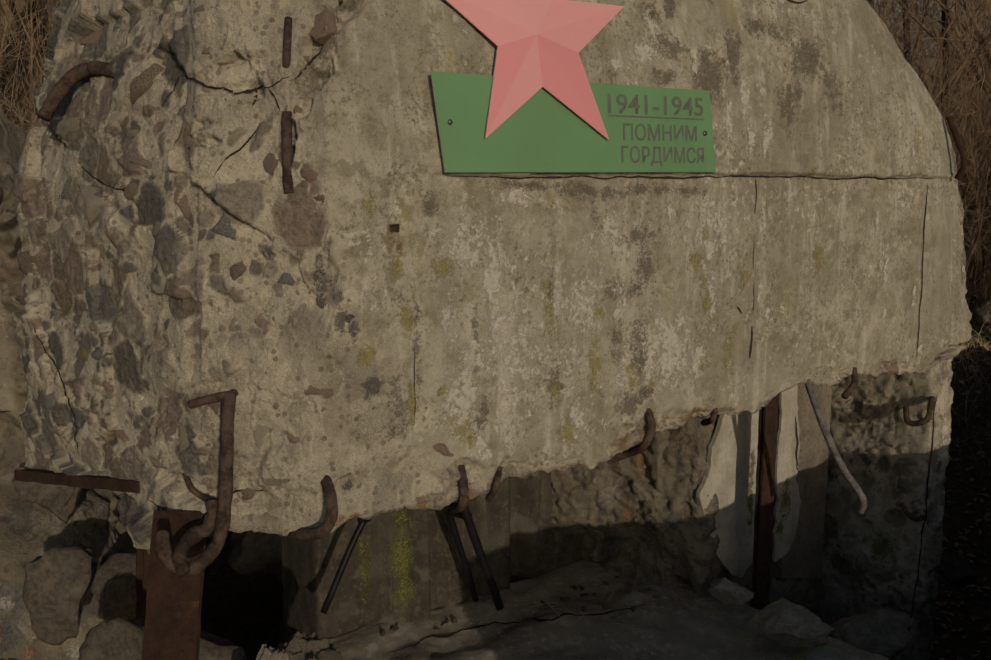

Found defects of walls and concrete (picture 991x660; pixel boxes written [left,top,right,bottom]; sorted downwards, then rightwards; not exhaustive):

spalling [36,61,114,122]
crack [80,166,125,191]
crack [161,46,323,177]
spalling [280,109,297,194]
spalling [282,16,342,106]
crack [33,326,78,453]
spalling [155,389,238,577]
spalling [281,475,352,540]
spalling [421,465,471,513]
spalling [607,408,658,464]
peeling [696,407,759,577]
peeling [772,379,867,562]